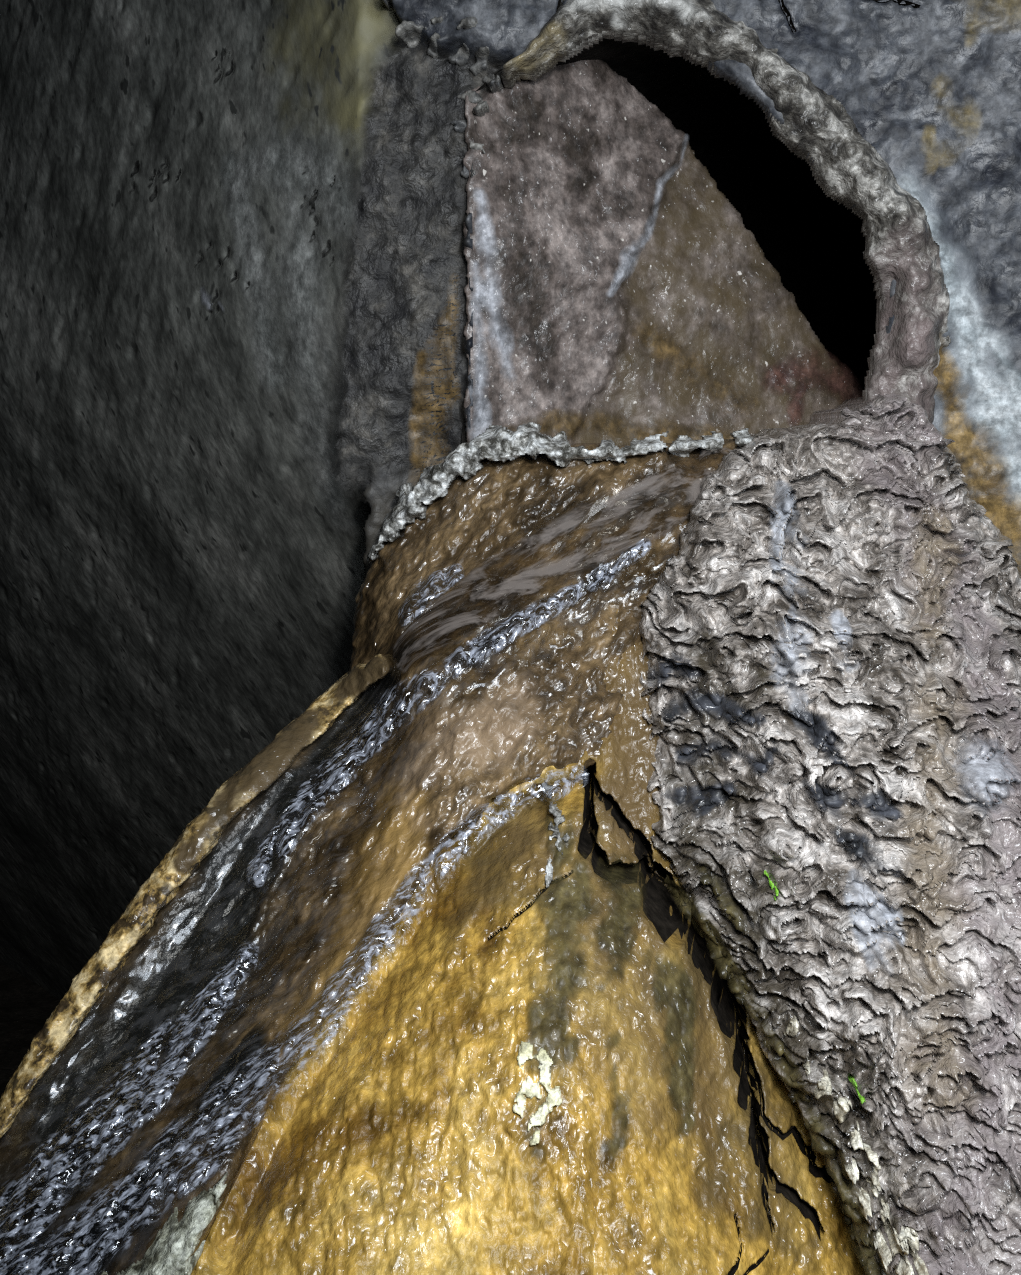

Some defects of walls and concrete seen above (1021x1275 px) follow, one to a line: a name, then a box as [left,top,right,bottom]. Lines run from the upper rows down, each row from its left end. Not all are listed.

crack [779,0,796,33]
crack [874,0,921,8]
efflorescence [926,214,1021,504]
efflorescence [542,783,570,888]
water stain [597,860,642,975]
crack [488,764,837,1275]
efflorescence [513,1041,562,1146]
water stain [605,1069,629,1155]
efflorescence [101,1172,228,1275]